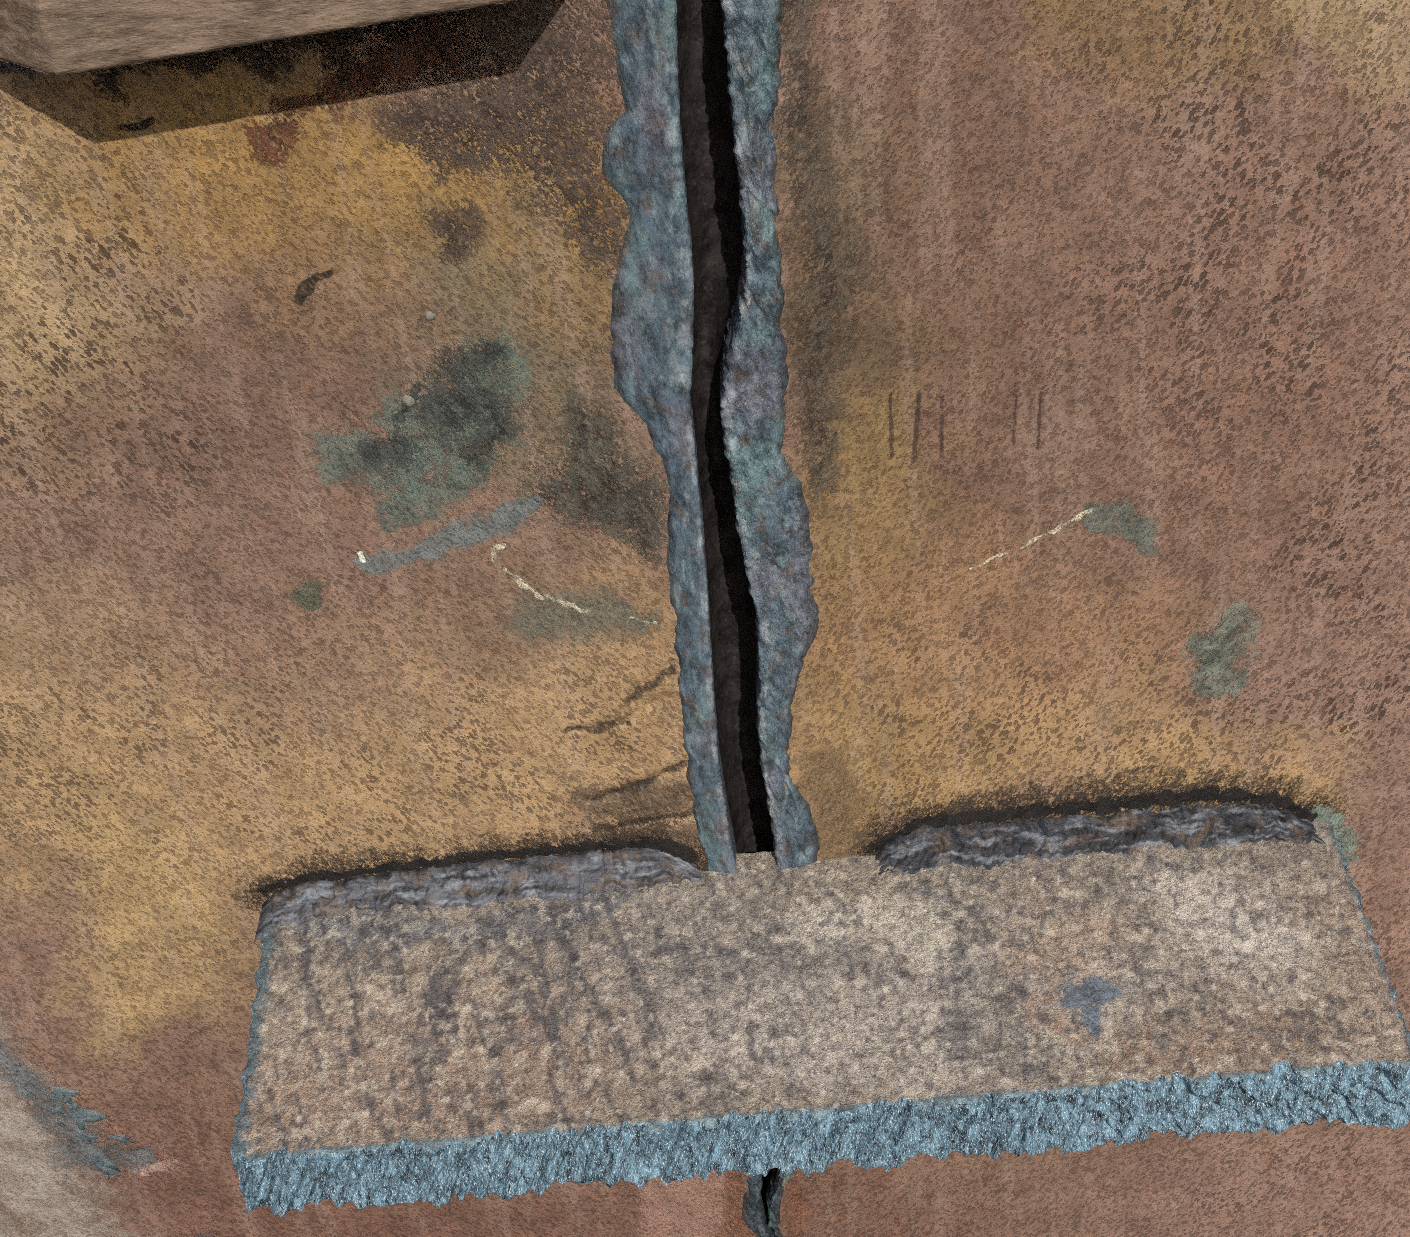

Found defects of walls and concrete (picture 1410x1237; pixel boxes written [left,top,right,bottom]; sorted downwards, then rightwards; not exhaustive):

crack [564,0,820,873]
crack [741,1168,786,1237]